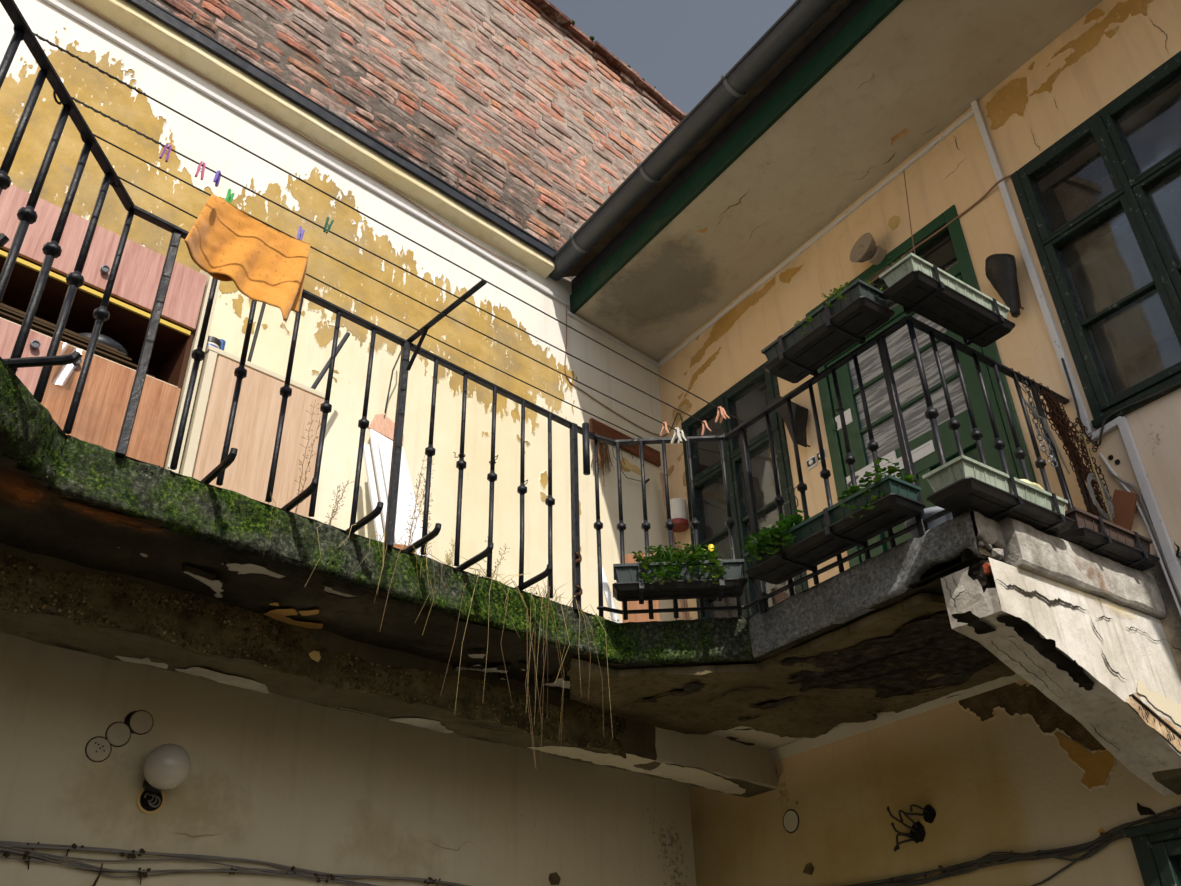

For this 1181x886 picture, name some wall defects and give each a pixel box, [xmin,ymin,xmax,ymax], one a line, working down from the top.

peeling [968,0,1158,132]
peeling [0,27,578,455]
water stain [610,242,710,321]
peeling [539,470,548,502]
peeling [115,656,270,693]
peeling [181,561,291,598]
spalling [264,603,626,759]
spalling [780,538,1094,699]
crack [939,574,966,613]
spalling [957,682,1117,791]
crack [987,634,1121,753]
crack [996,579,1181,680]